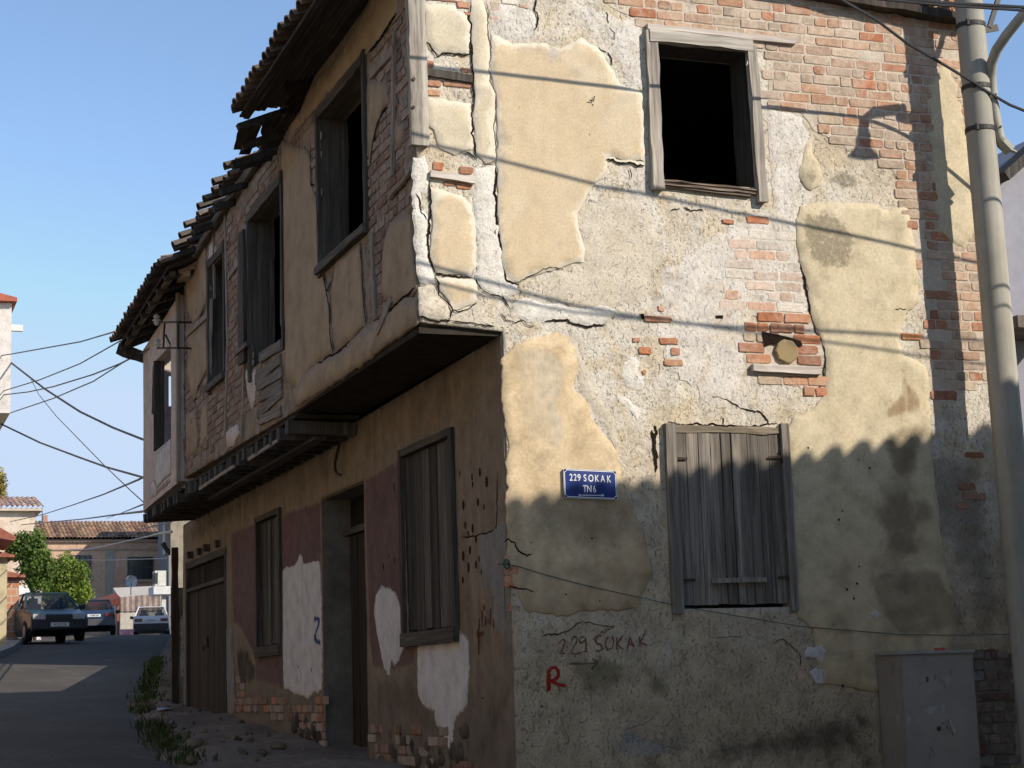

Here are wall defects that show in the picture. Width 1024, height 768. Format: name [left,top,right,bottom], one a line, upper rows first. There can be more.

flaking render [367,1,413,317]
crack [360,0,607,328]
crack [605,157,645,179]
flaking render [603,0,987,404]
crack [318,267,350,364]
crack [651,396,777,472]
flaking render [233,677,329,746]